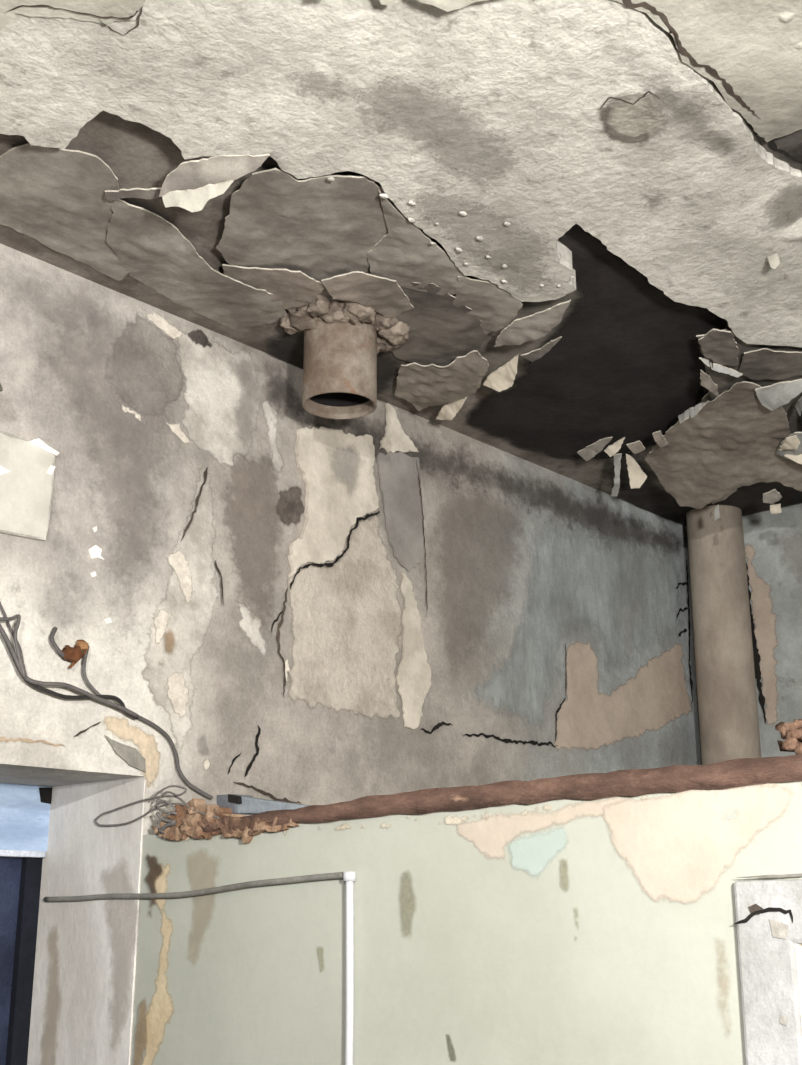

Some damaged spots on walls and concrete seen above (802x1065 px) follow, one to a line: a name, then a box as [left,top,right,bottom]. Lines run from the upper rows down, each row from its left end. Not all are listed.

crack [623,0,802,163]
flaking render [0,0,802,754]
damp [269,378,682,724]
peeling [134,855,174,1065]
crack [228,726,300,803]
peeling [445,782,791,904]
crack [734,904,793,924]
crack [736,871,802,879]